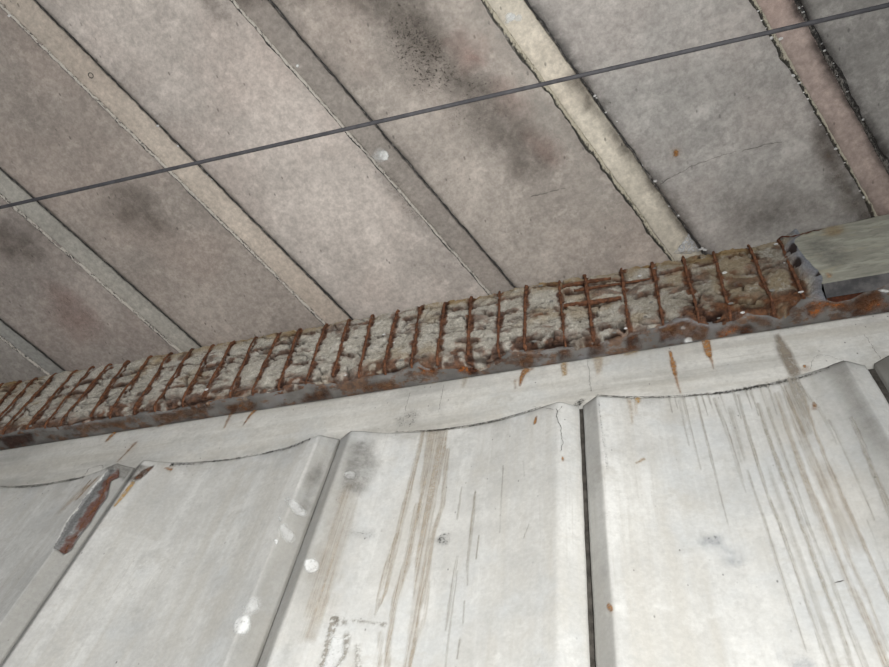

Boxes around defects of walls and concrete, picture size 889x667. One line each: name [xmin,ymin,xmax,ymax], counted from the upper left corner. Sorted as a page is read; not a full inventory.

spalling [0,229,826,438]